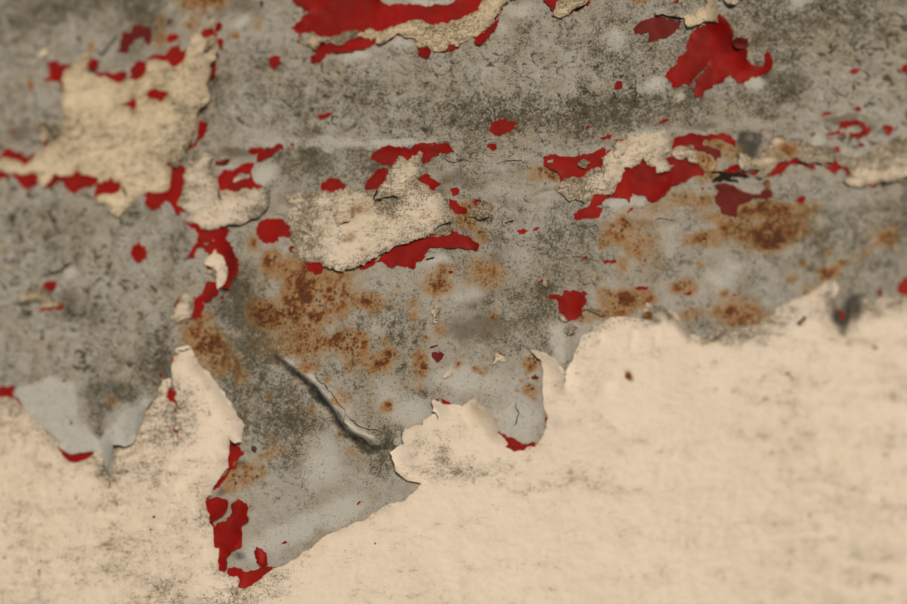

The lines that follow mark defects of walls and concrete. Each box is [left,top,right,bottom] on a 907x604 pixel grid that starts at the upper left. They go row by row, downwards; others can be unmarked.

rust [147,0,243,55]
peeling [287,0,594,70]
peeling [591,0,777,109]
peeling [779,0,824,19]
peeling [0,18,494,323]
peeling [543,103,907,220]
rust [567,132,907,337]
rust [171,198,516,418]
peeling [0,278,907,604]